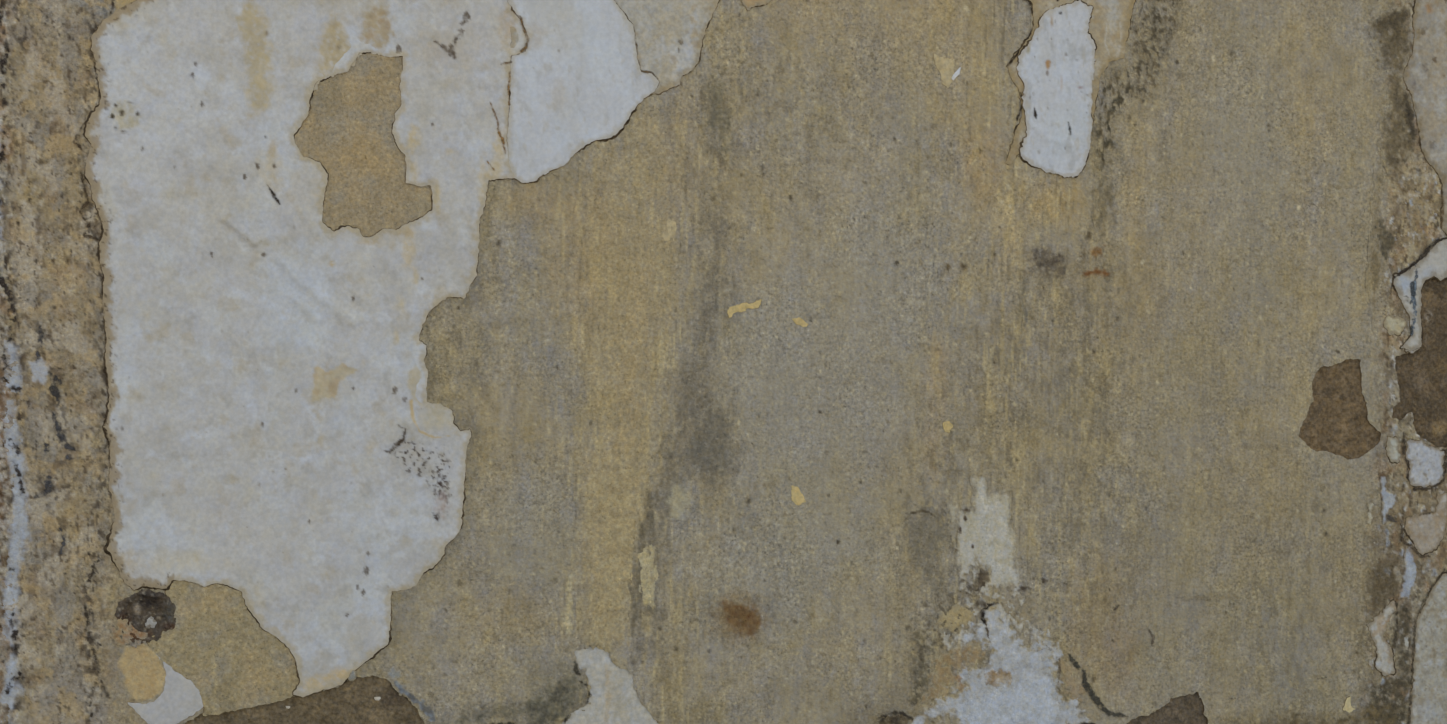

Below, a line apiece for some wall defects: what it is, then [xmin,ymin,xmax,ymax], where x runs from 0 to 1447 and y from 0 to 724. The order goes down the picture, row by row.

peeling [1005,0,1136,178]
peeling [83,0,720,724]
peeling [727,299,762,318]
peeling [1299,0,1447,556]
peeling [791,485,806,505]
rust [699,585,779,653]
spalling [1127,692,1208,724]
peeling [1367,571,1447,724]